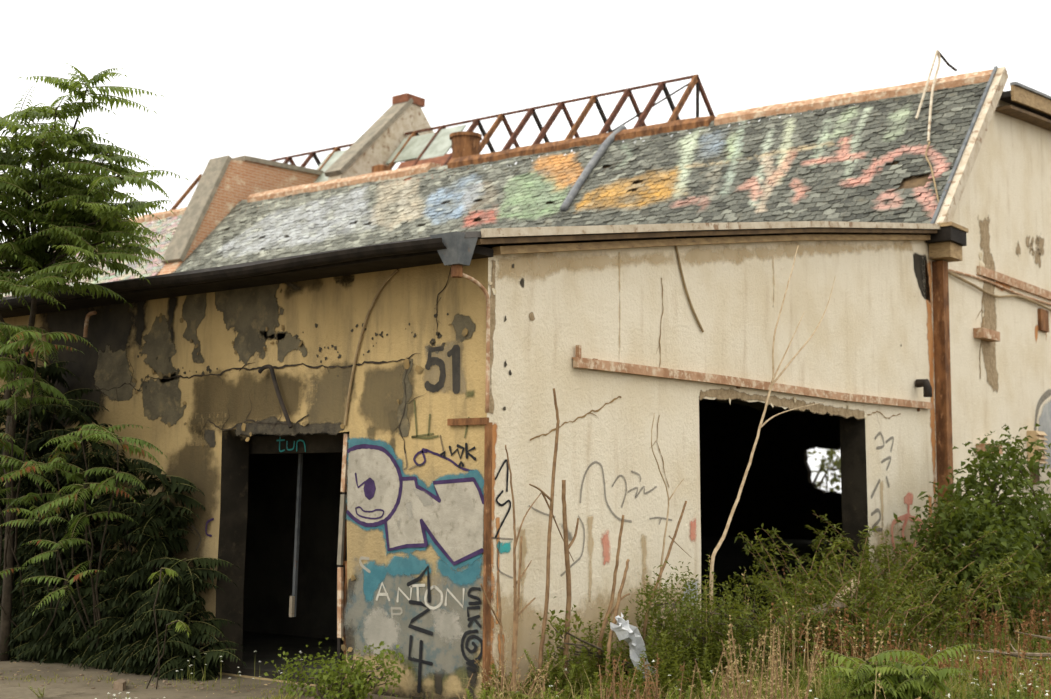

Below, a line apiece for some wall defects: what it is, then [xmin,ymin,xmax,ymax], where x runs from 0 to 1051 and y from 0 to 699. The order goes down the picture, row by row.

corrosion [392,153,453,187]
flaking render [94,282,341,428]
crack [92,268,451,453]
corrosion [925,259,937,527]